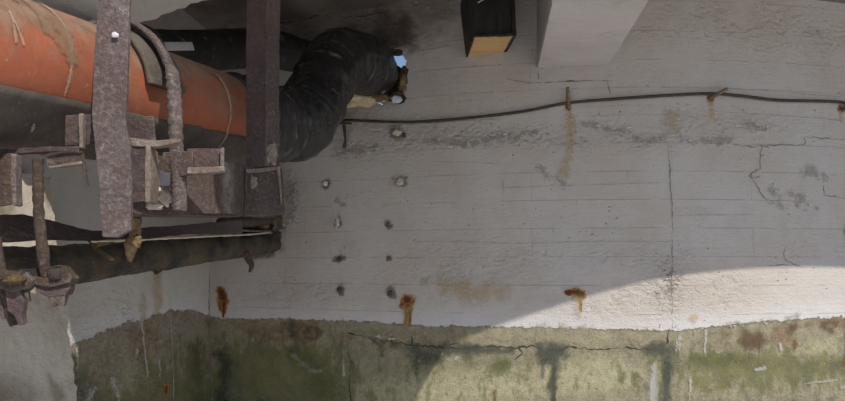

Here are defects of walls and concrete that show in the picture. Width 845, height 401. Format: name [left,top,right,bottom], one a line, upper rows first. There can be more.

crack [714,111,844,200]
crack [414,144,748,344]
rust [216,286,229,318]
rust [399,294,416,327]
rust [564,287,587,312]
crack [347,332,460,401]
damp [377,340,514,375]
crack [484,345,545,360]
damp [538,342,568,401]
crack [565,344,646,352]
damp [643,336,682,401]
damp [742,330,764,349]